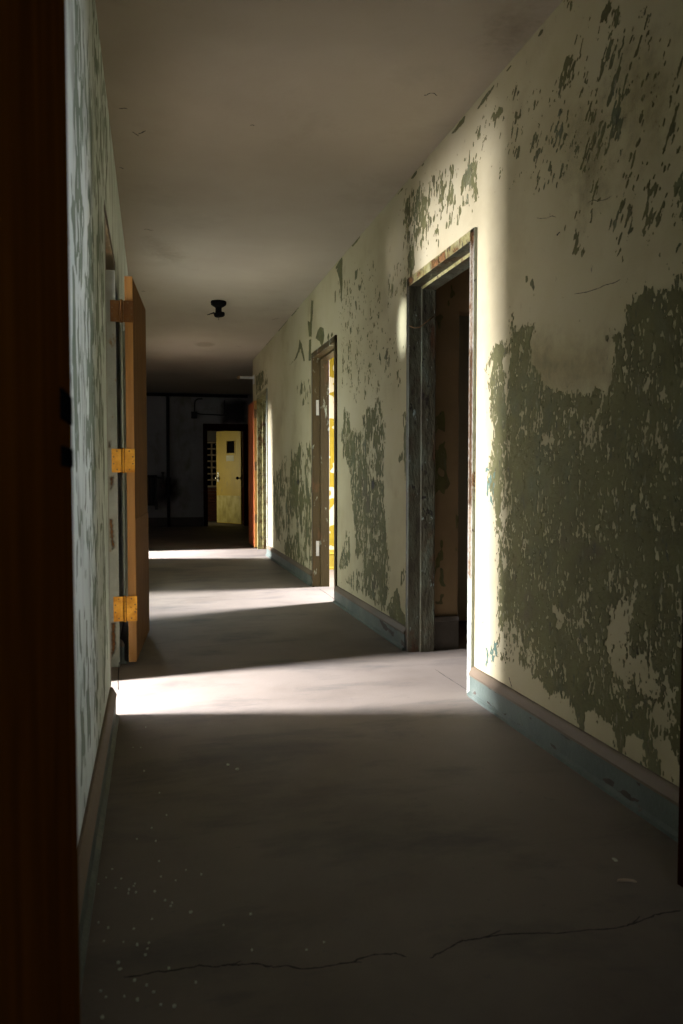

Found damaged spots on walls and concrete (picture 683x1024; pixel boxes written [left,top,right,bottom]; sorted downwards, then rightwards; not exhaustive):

peeling [273,442,312,569]
peeling [291,0,683,636]
peeling [484,243,683,782]
crack [126,910,681,977]